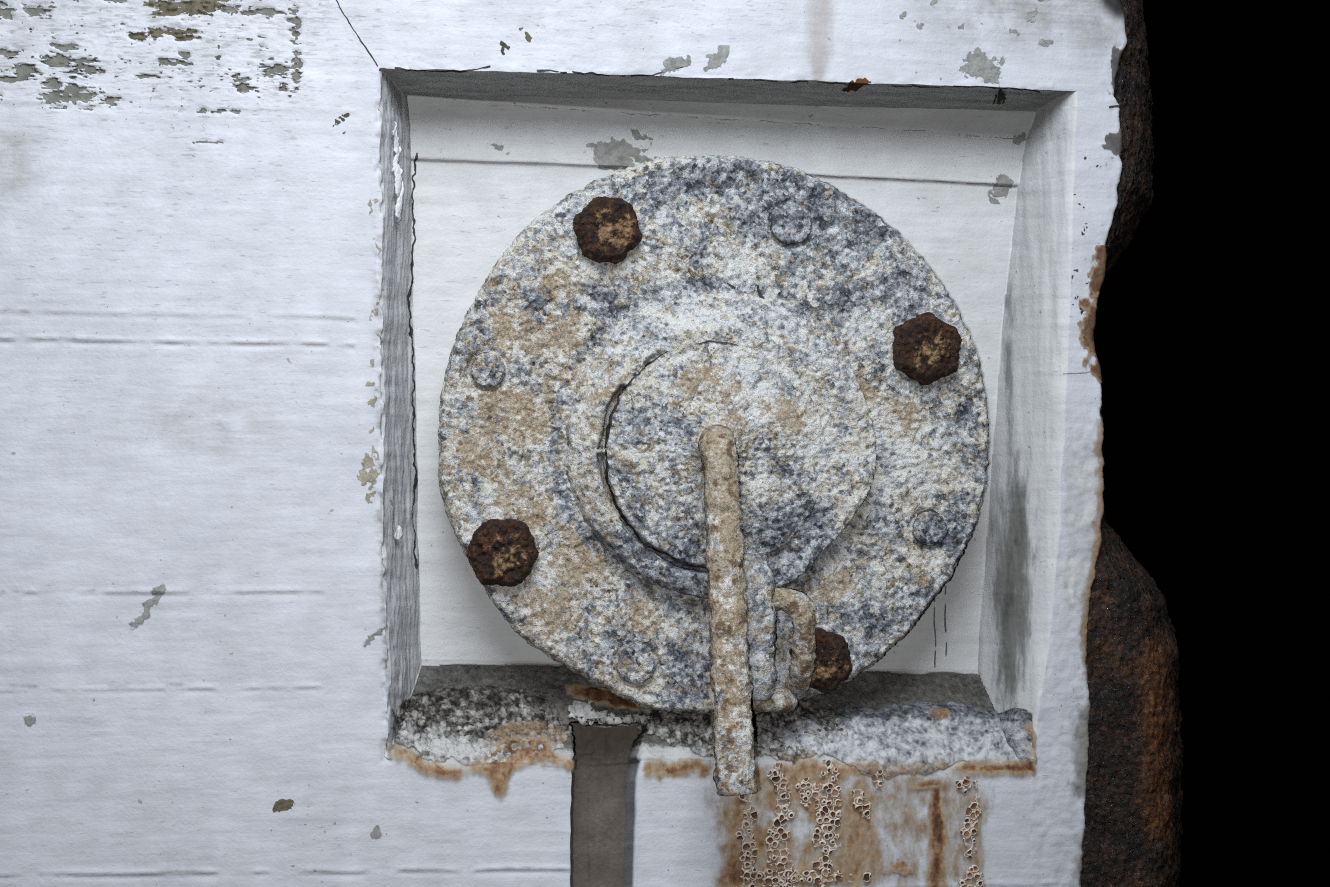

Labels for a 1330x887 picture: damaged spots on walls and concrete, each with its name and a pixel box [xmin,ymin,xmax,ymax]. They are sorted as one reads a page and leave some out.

peeling [0,0,303,110]
peeling [197,106,241,114]
crack [336,0,491,73]
rust [842,78,871,92]
spalling [959,47,1005,83]
peeling [1110,46,1125,89]
rust [1077,245,1107,383]
crack [407,152,418,569]
spalling [357,427,380,504]
rust [1080,416,1104,673]
rust [386,735,575,796]
rust [716,724,1036,887]